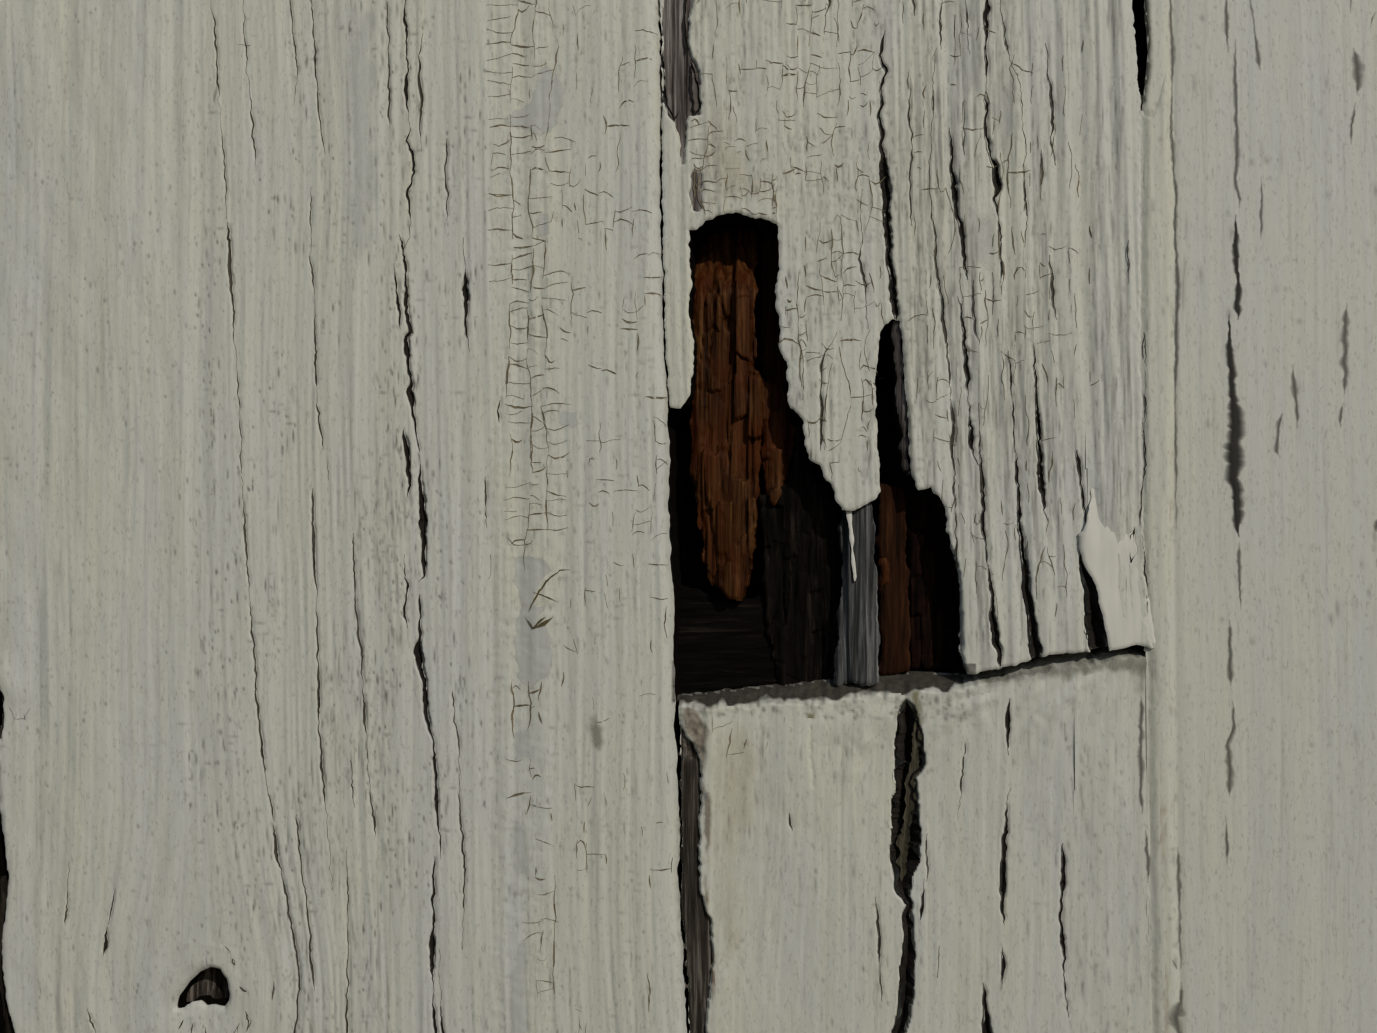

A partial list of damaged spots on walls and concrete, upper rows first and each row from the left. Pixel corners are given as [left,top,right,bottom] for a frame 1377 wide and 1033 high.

crack [1351,53,1360,137]
crack [1226,0,1263,792]
crack [1276,371,1298,453]
crack [1339,310,1347,422]
crack [179,0,376,1033]
crack [386,0,1106,1033]
peeling [1078,488,1156,651]